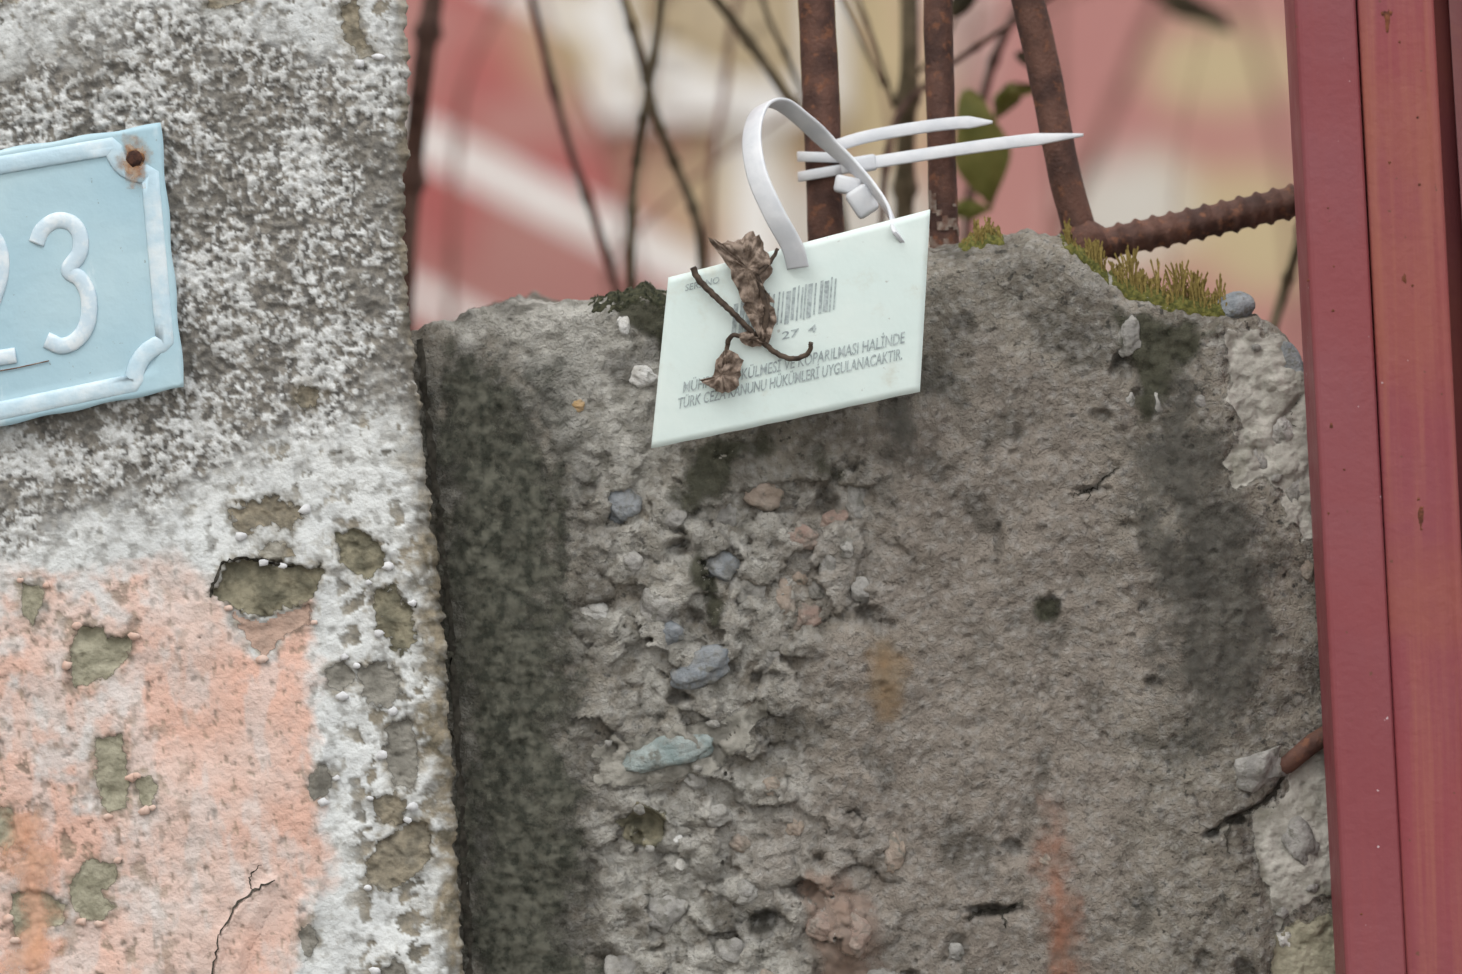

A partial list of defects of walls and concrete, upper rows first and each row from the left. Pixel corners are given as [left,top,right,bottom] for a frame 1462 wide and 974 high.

spalling [17,578,49,626]
damp [1137,396,1271,745]
spalling [62,622,141,687]
spalling [213,494,432,893]
damp [435,343,603,974]
spalling [93,733,158,821]
spalling [0,807,16,851]
spalling [2,857,122,944]
crack [211,865,275,974]
spalling [298,924,318,957]
spalling [368,957,406,974]